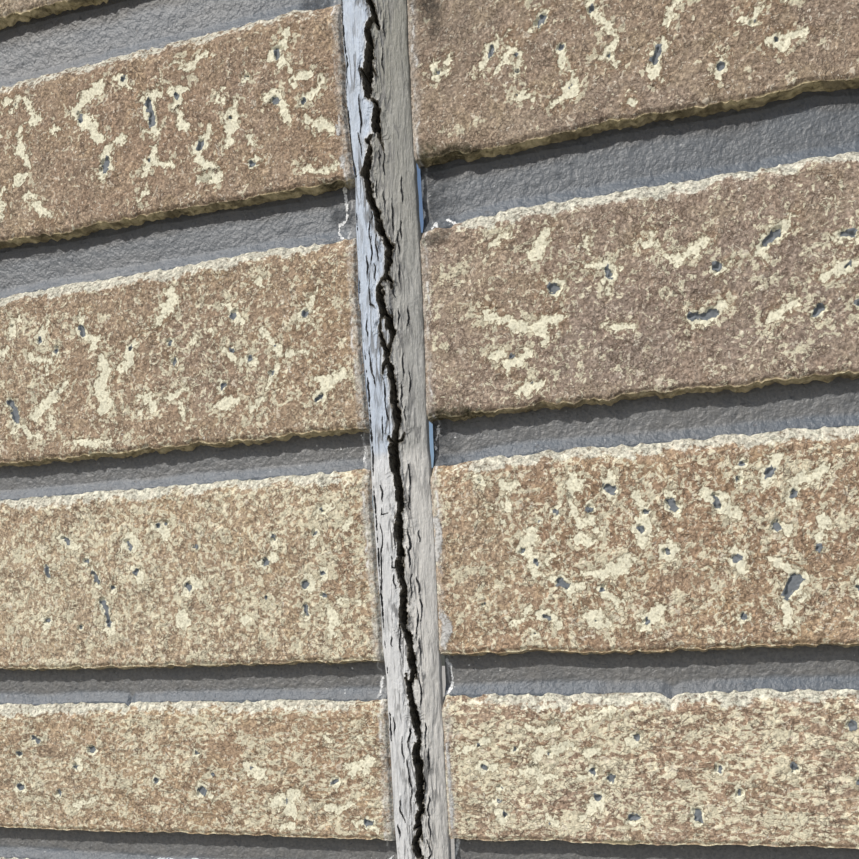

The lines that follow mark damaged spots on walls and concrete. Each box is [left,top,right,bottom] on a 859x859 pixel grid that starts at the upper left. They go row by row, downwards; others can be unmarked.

crack [341,0,445,859]